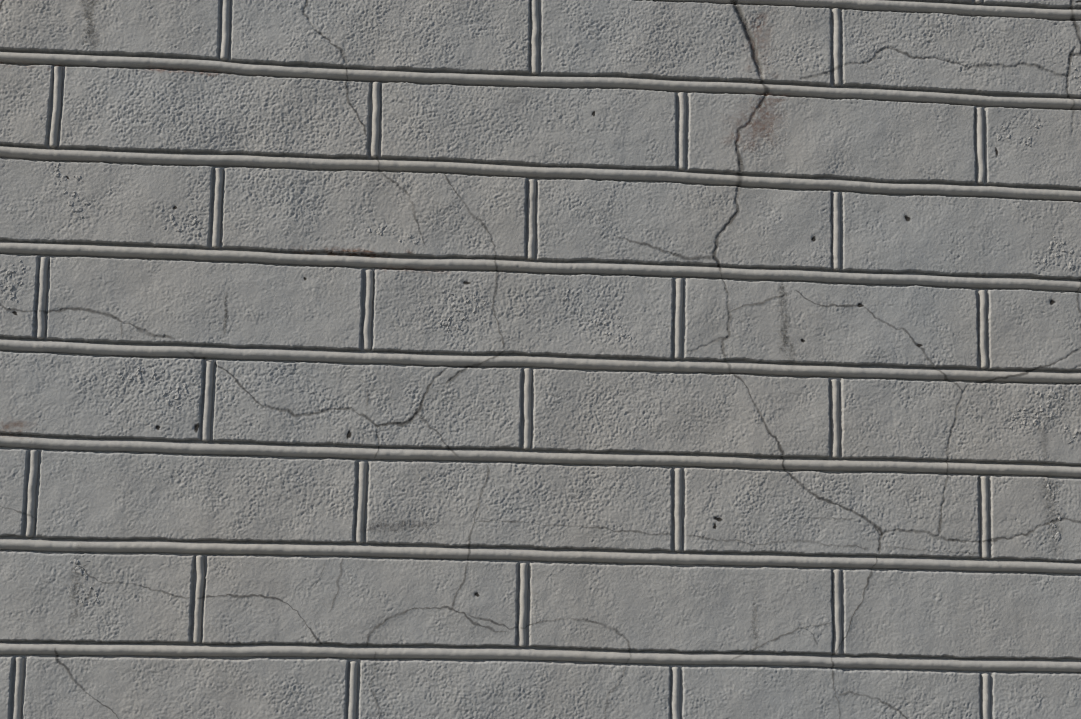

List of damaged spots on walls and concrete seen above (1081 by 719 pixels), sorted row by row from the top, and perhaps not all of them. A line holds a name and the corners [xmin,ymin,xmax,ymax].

crack [733,0,767,107]
crack [676,205,739,268]
crack [375,371,462,440]